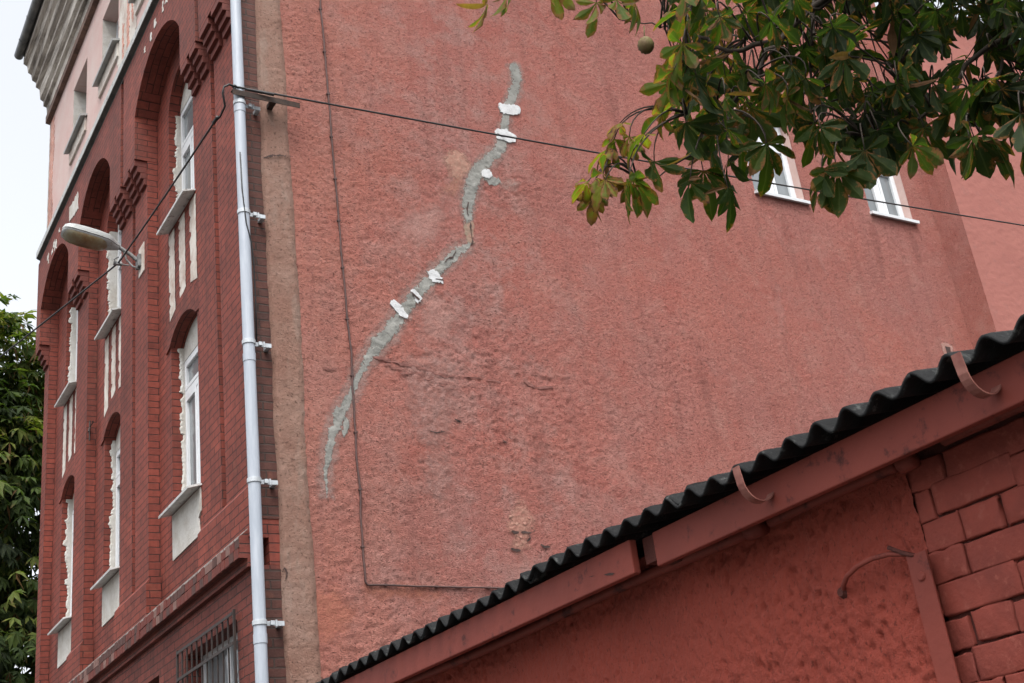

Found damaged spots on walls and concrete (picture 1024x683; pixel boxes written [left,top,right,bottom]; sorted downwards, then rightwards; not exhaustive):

crack [317,62,553,498]